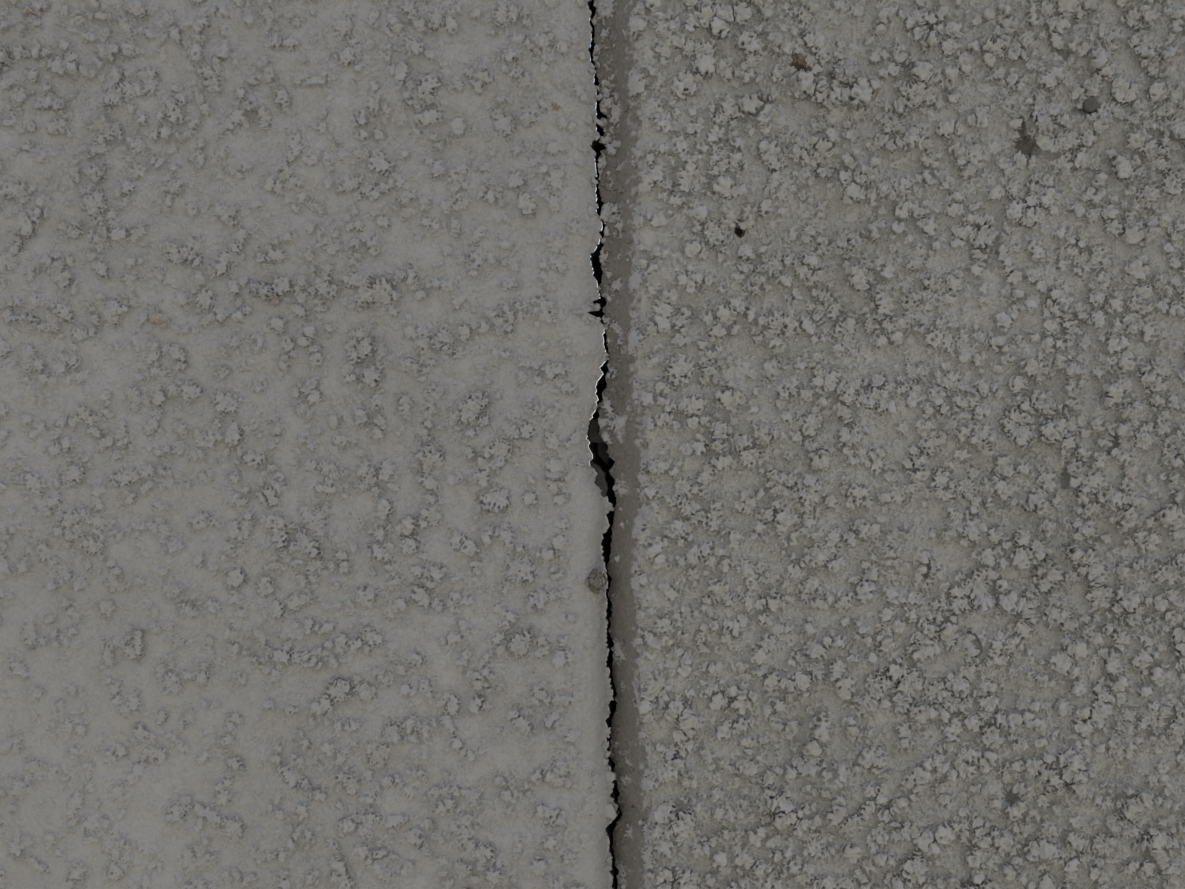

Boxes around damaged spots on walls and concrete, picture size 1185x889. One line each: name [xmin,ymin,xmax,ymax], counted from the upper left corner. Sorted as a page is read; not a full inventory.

crack [587,0,622,889]